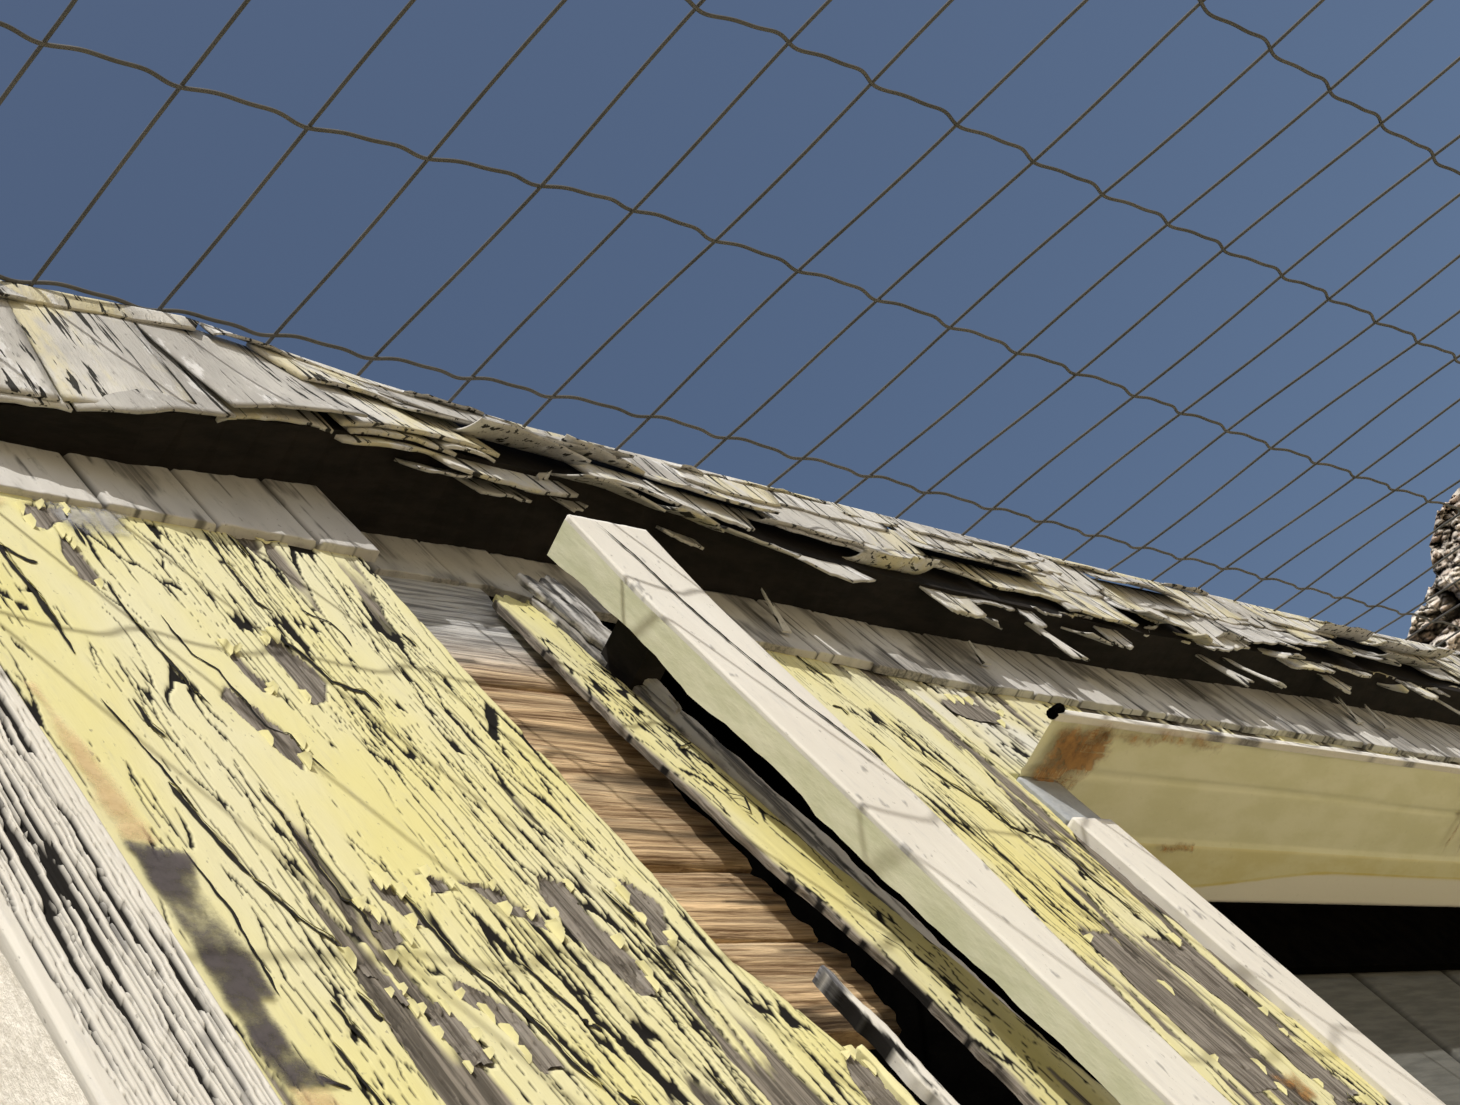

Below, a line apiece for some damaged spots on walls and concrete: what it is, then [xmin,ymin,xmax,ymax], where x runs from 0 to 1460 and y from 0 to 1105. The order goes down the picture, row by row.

peeling [15,498,104,589]
peeling [217,626,325,770]
rust [1034,728,1206,790]
peeling [337,864,660,1074]
peeling [610,878,678,950]
spalling [653,669,1102,1105]
peeling [1079,929,1287,1095]
peeling [1142,933,1376,1105]